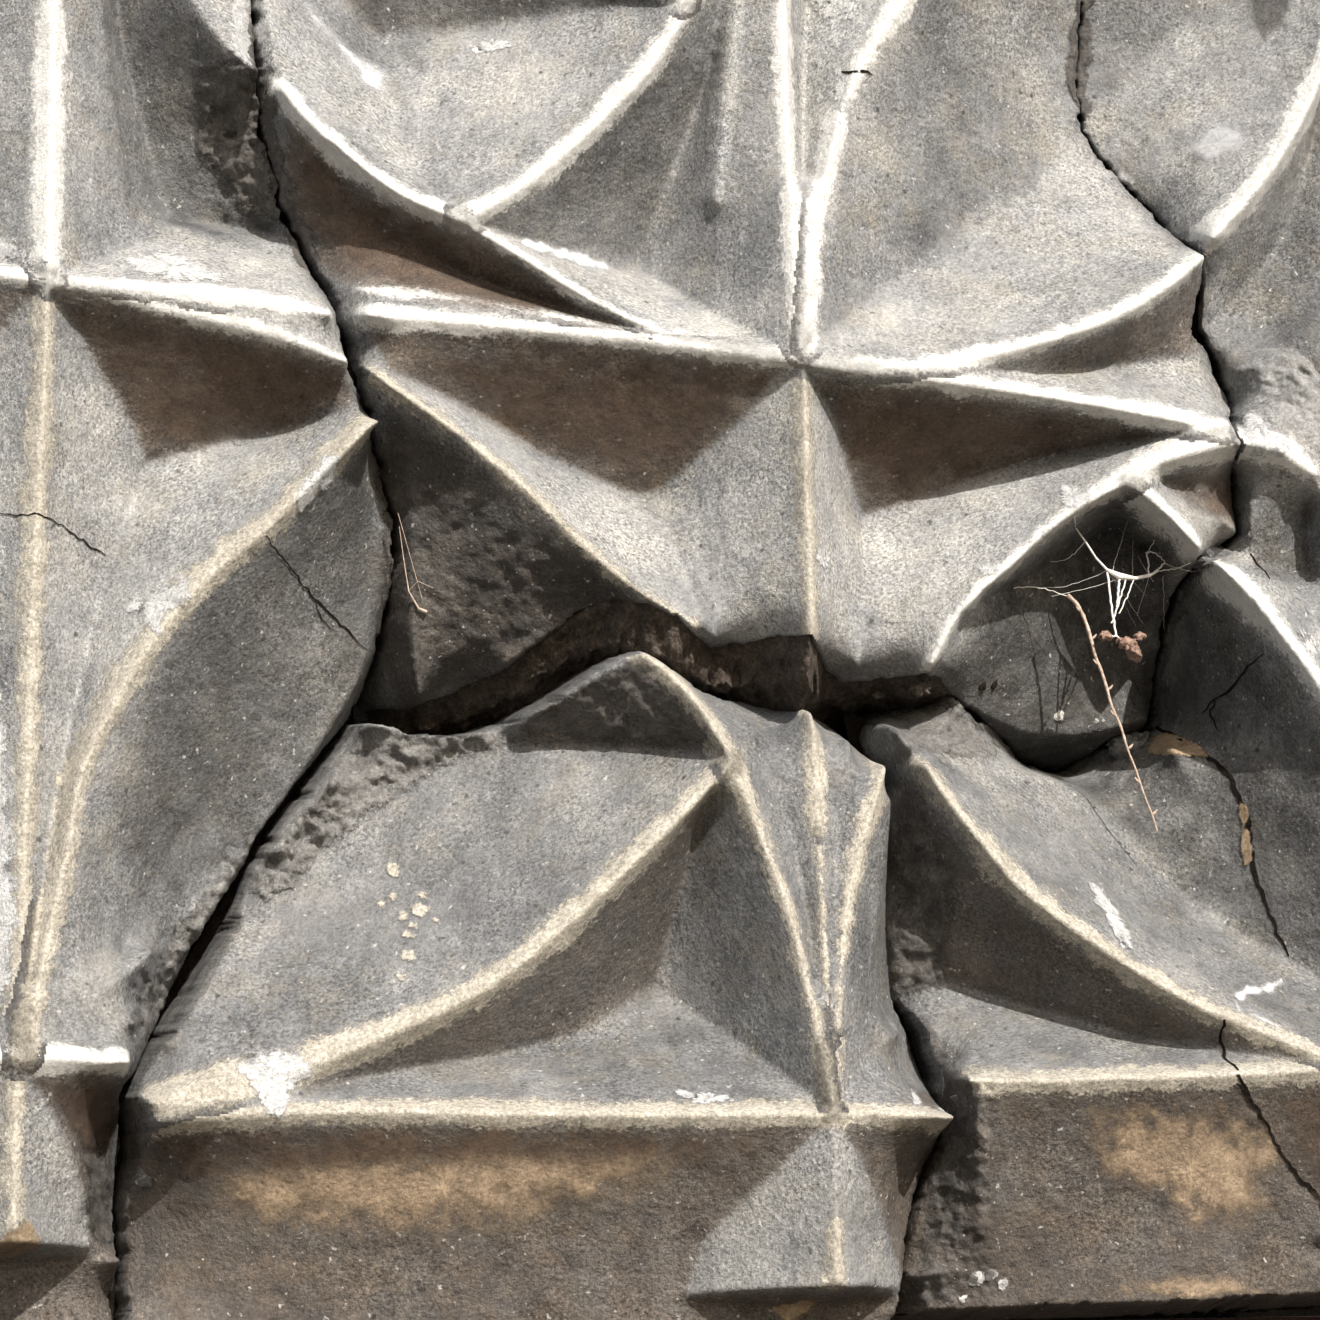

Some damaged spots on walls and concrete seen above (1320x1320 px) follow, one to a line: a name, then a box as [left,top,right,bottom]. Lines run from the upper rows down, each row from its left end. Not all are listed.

crack [834,68,873,76]
crack [1065,0,1136,196]
crack [245,0,367,413]
crack [1154,219,1241,479]
crack [0,512,105,555]
crack [266,468,394,686]
crack [842,710,867,755]
crack [964,537,1289,957]
crack [159,722,346,1017]
crack [893,1005,923,1080]
crack [108,1115,124,1320]
leakage [1096,1106,1276,1222]